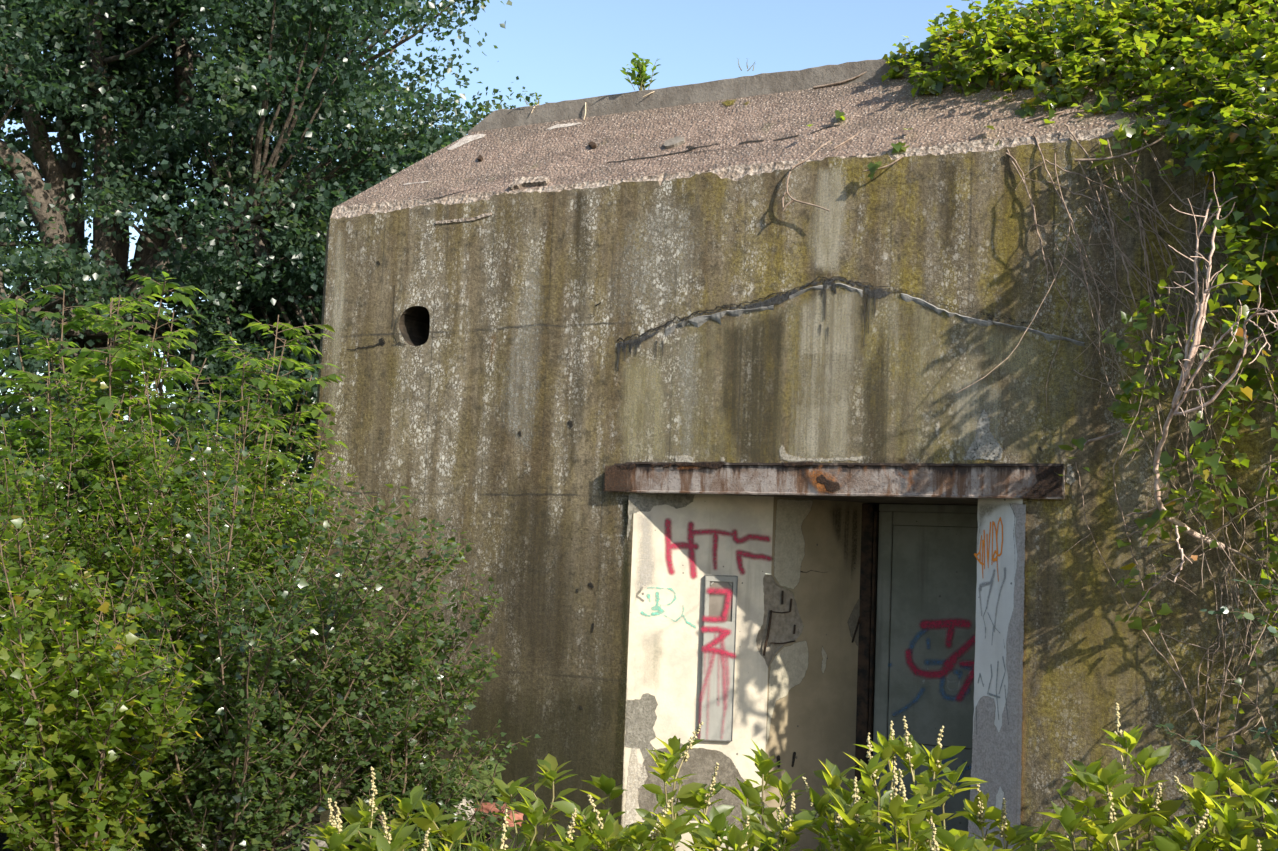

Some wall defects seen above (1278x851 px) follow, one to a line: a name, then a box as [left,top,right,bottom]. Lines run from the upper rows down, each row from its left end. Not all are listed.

leakage [815,169,844,269]
leakage [725,318,781,461]
leakage [795,293,852,458]
crack [617,276,1085,372]
corrosion [604,463,635,492]
corrosion [651,461,725,469]
corrosion [782,461,854,493]
corrosion [1020,466,1063,498]
leakage [612,519,652,827]
spalling [756,574,827,745]
peeling [968,503,1026,851]
peeling [624,693,768,840]